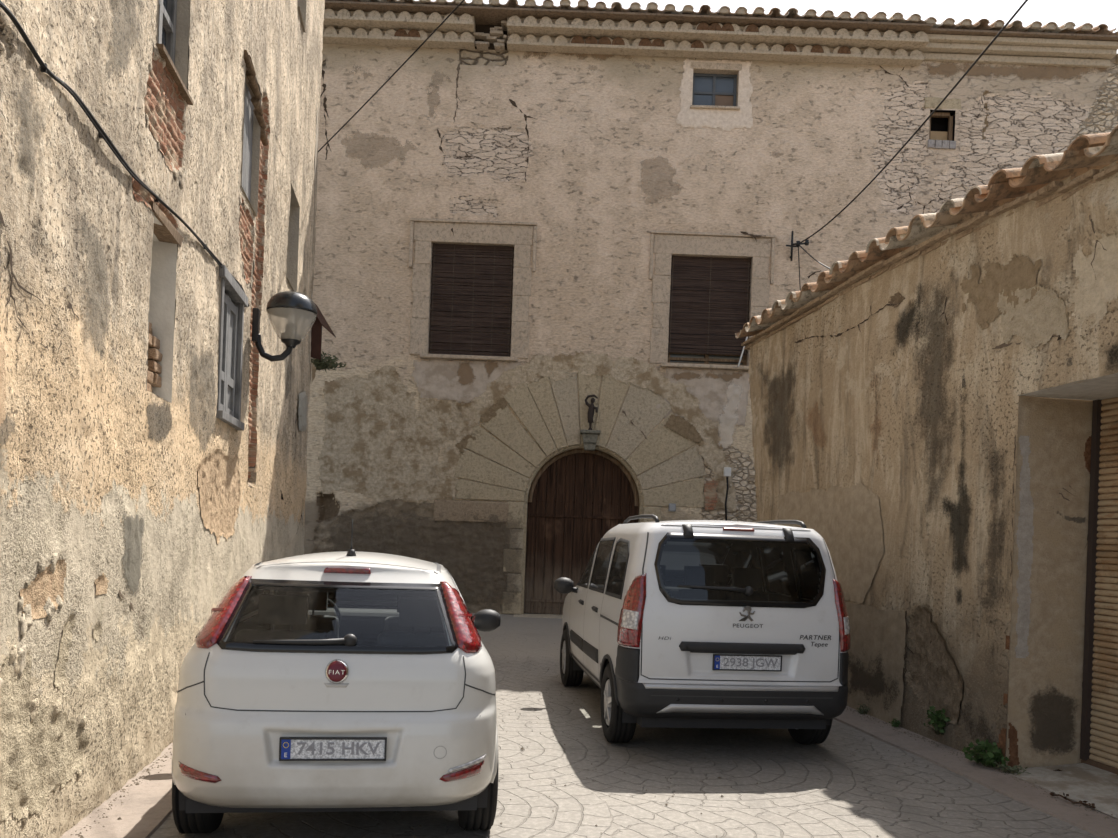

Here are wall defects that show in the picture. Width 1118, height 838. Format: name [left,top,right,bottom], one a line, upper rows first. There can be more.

spalling [144,42,186,189]
crack [437,64,535,181]
spalling [441,125,533,182]
peeling [197,87,270,544]
crack [795,298,905,343]
peeling [960,231,1118,350]
damp [1106,345,1118,370]
damp [761,370,795,468]
damp [895,285,971,575]
damp [981,452,1005,623]
peeling [0,553,88,828]
damp [1029,687,1075,753]